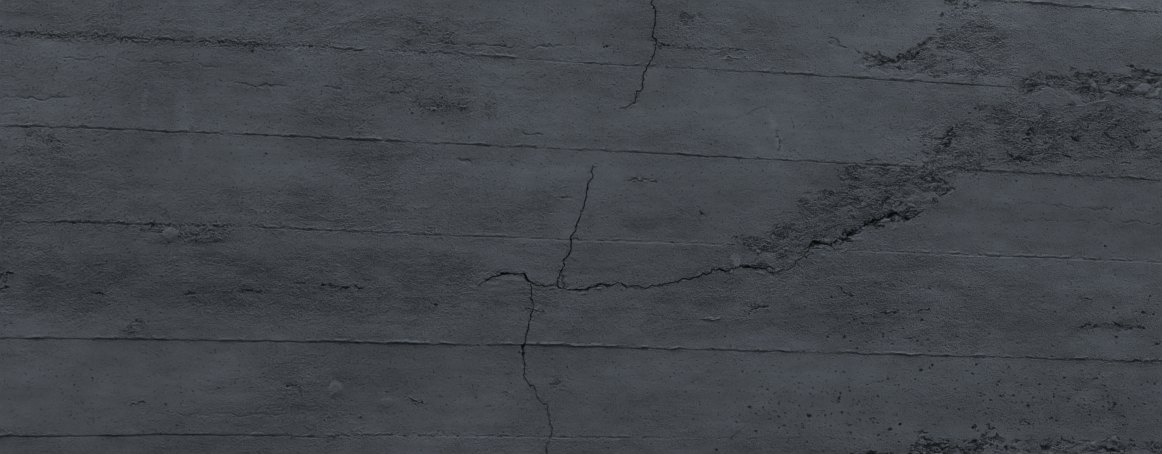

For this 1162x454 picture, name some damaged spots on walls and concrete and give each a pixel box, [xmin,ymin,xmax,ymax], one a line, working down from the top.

crack [620,0,658,109]
spalling [837,0,1162,111]
spalling [731,130,988,271]
crack [476,165,924,454]